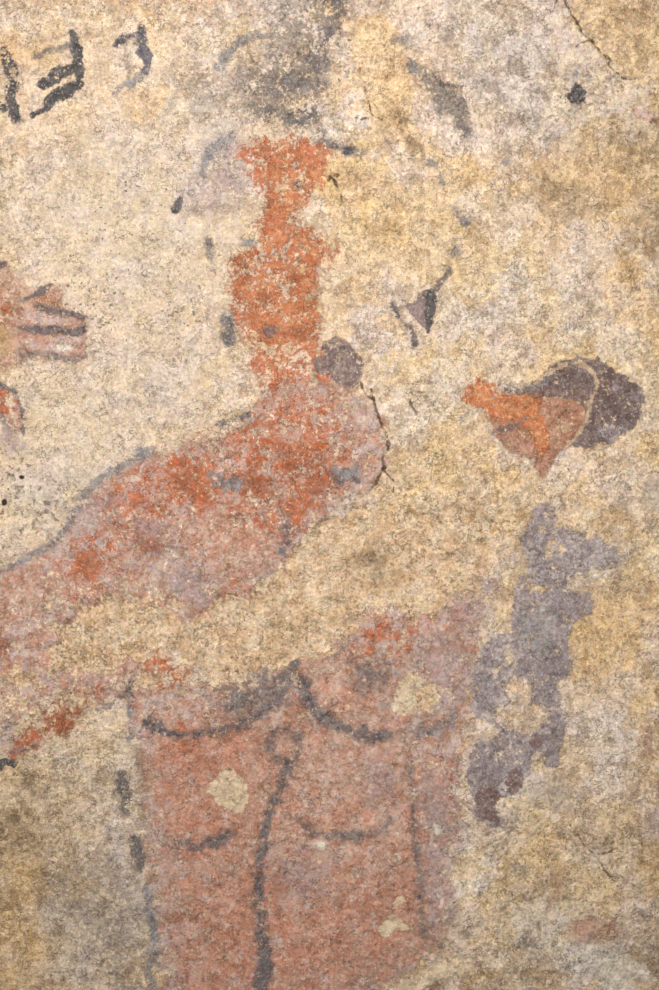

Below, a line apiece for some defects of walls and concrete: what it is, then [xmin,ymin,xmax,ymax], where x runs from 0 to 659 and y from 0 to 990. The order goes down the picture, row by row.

crack [554,0,635,80]
crack [360,381,394,492]